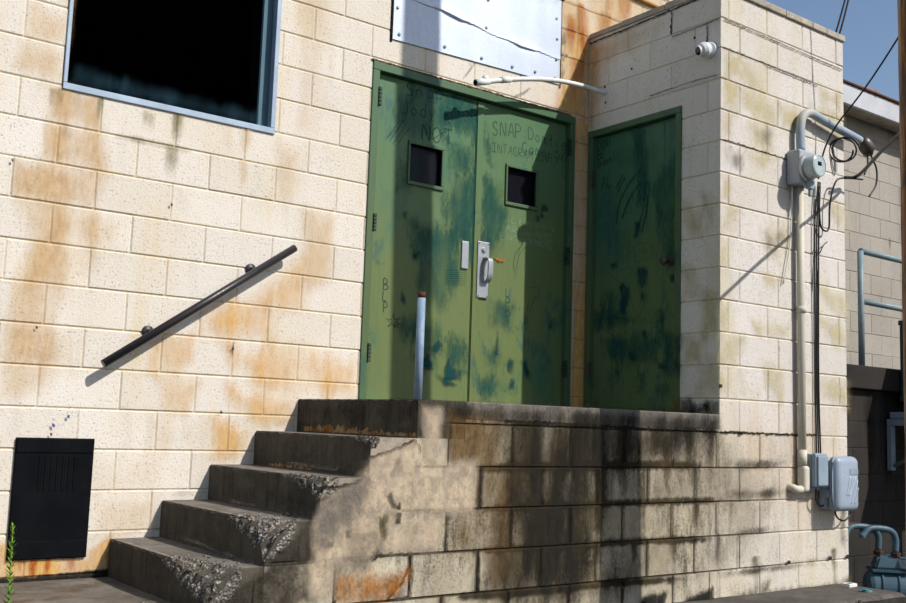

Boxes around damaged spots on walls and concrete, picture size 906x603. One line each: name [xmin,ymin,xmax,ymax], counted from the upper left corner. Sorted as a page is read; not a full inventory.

corrosion [568,3,585,46]
leakage [309,249,720,603]
spalling [269,463,339,501]
spalling [228,513,297,562]
leakage [738,529,783,573]
spalling [162,554,242,603]